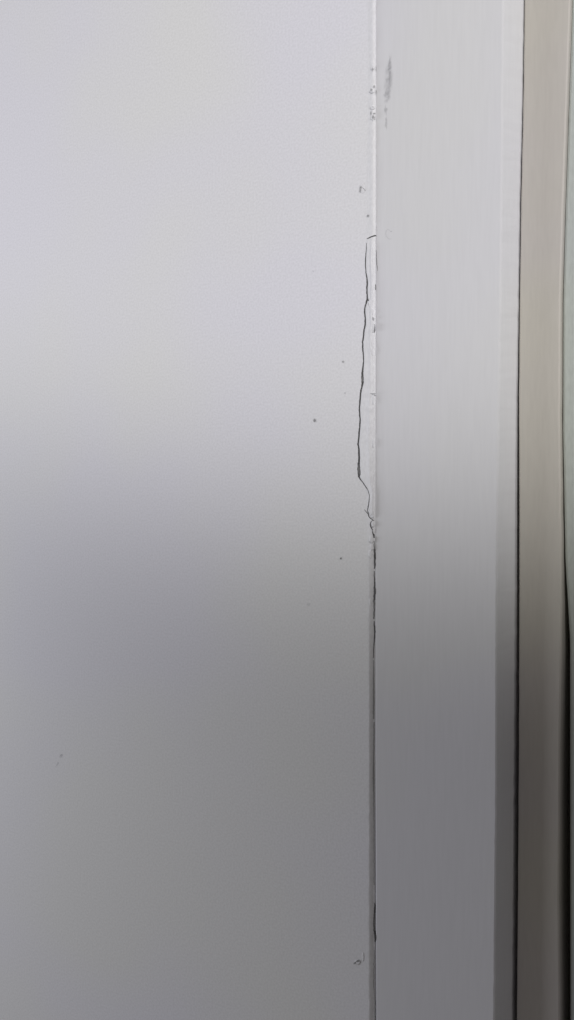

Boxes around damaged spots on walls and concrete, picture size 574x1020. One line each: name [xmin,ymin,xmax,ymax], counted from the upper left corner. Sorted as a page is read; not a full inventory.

crack [357,235,378,864]
crack [370,903,378,1018]